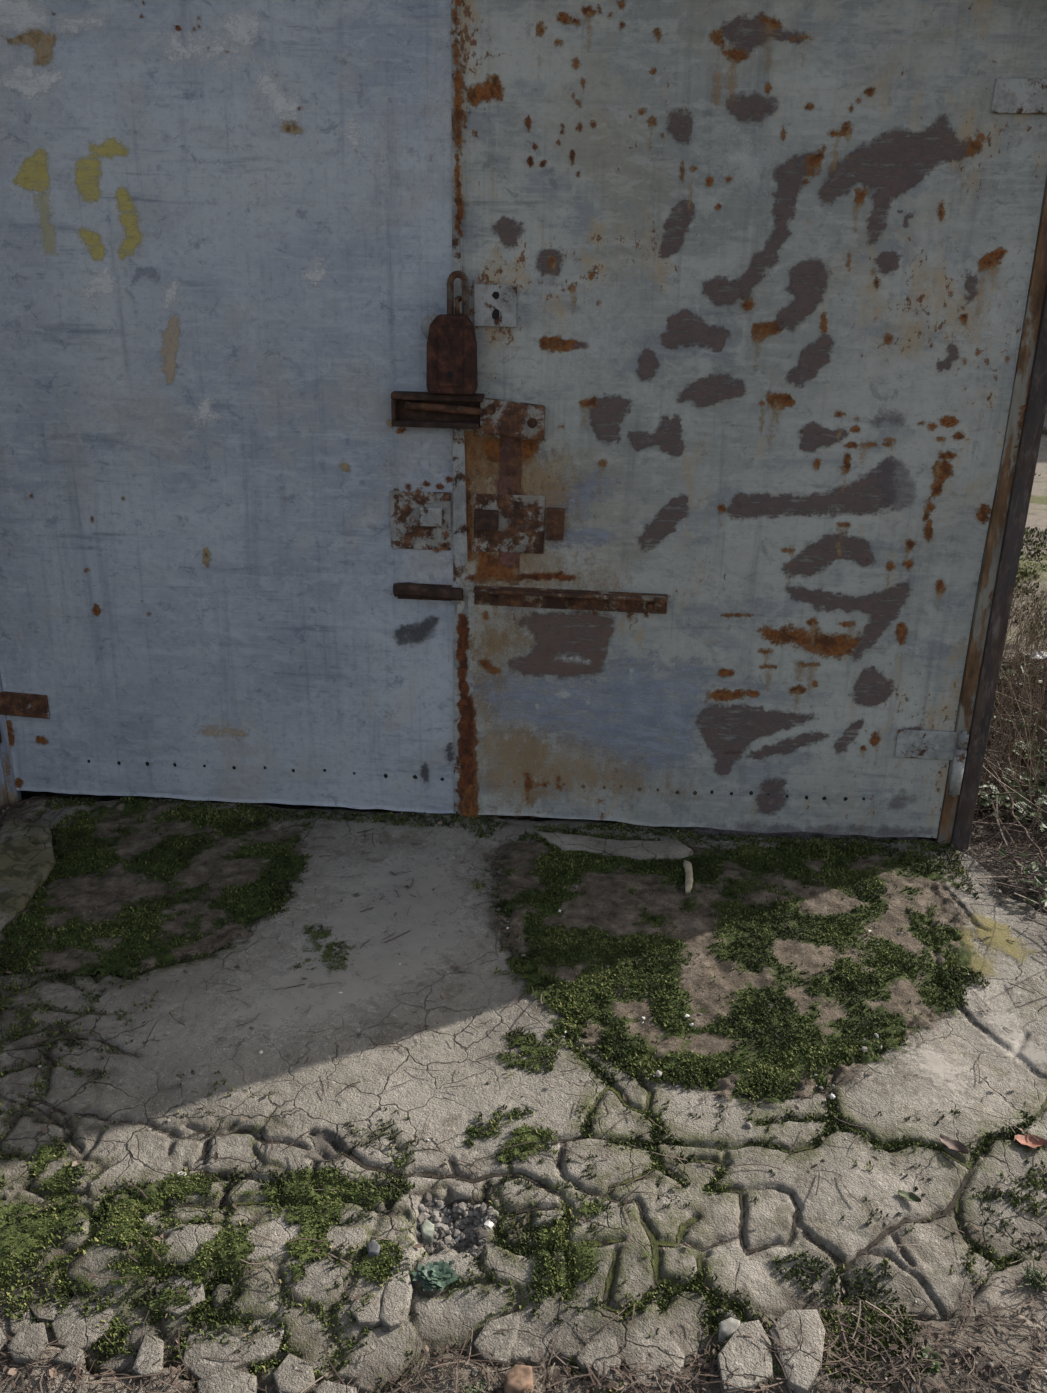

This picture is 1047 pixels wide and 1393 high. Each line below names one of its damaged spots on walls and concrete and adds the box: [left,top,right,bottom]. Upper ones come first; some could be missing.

corrosion [978,247,1007,272]
corrosion [394,430,619,591]
corrosion [976,504,992,524]
corrosion [705,613,861,703]
corrosion [895,622,908,645]
corrosion [4,720,24,788]
corrosion [456,611,519,818]
corrosion [860,732,881,753]
crack [956,1005,1031,1070]
crack [2,1038,1047,1332]